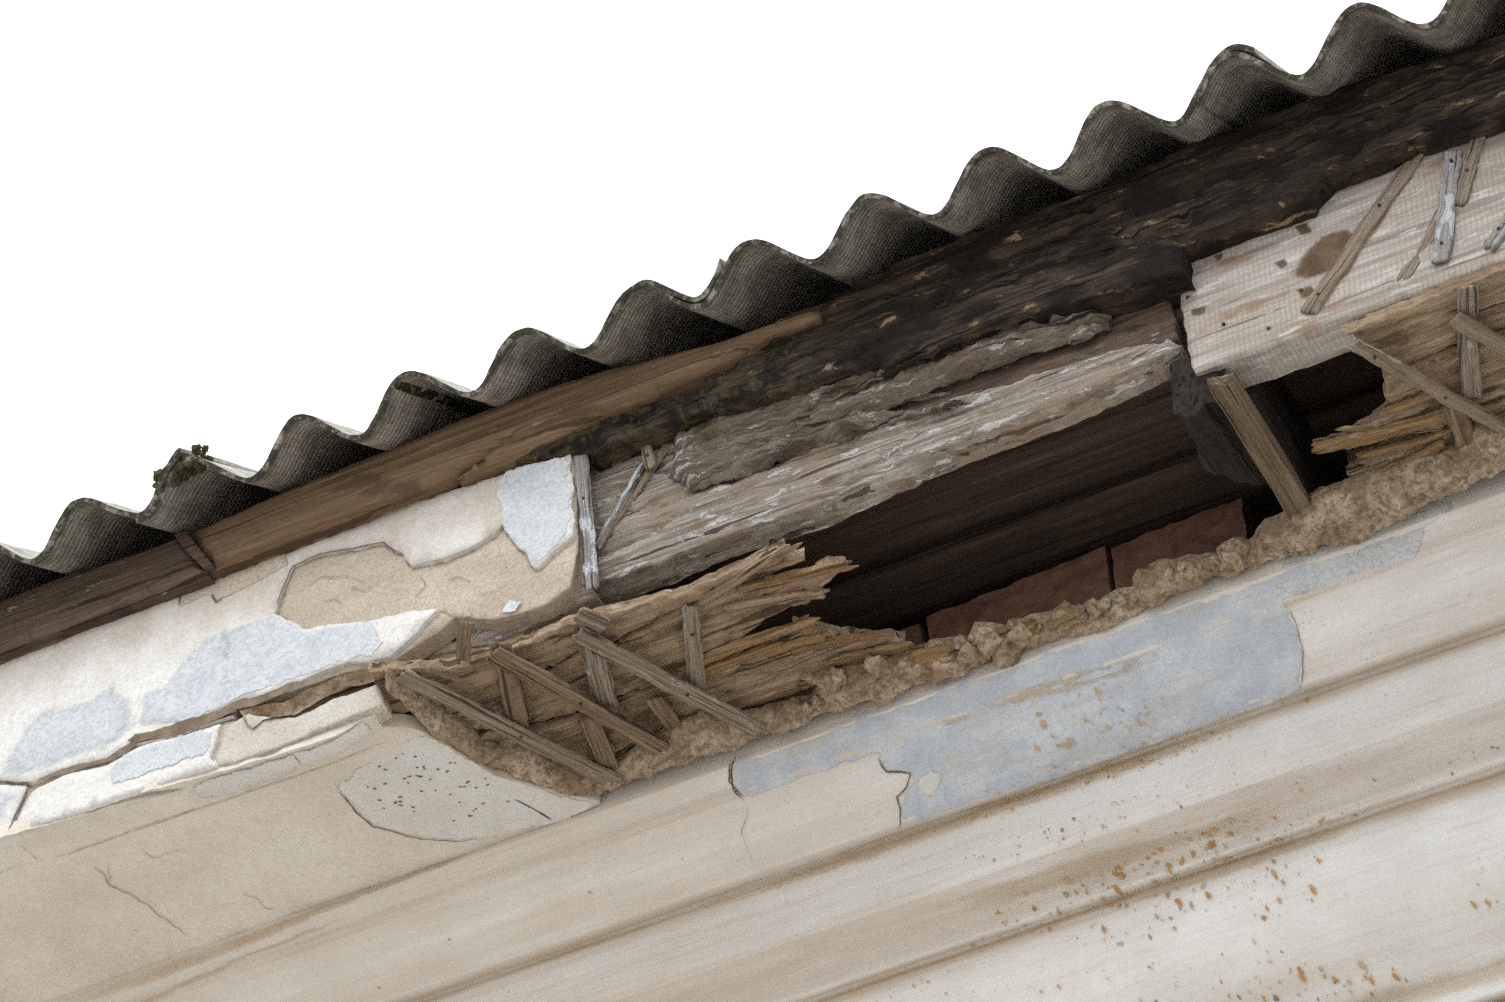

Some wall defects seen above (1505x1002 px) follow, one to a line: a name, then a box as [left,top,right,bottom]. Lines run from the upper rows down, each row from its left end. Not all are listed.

peeling [5,412,1505,838]
crack [0,684,485,934]
corrosion [969,682,1329,822]
corrosion [965,751,1395,960]
corrosion [1189,938,1375,1002]